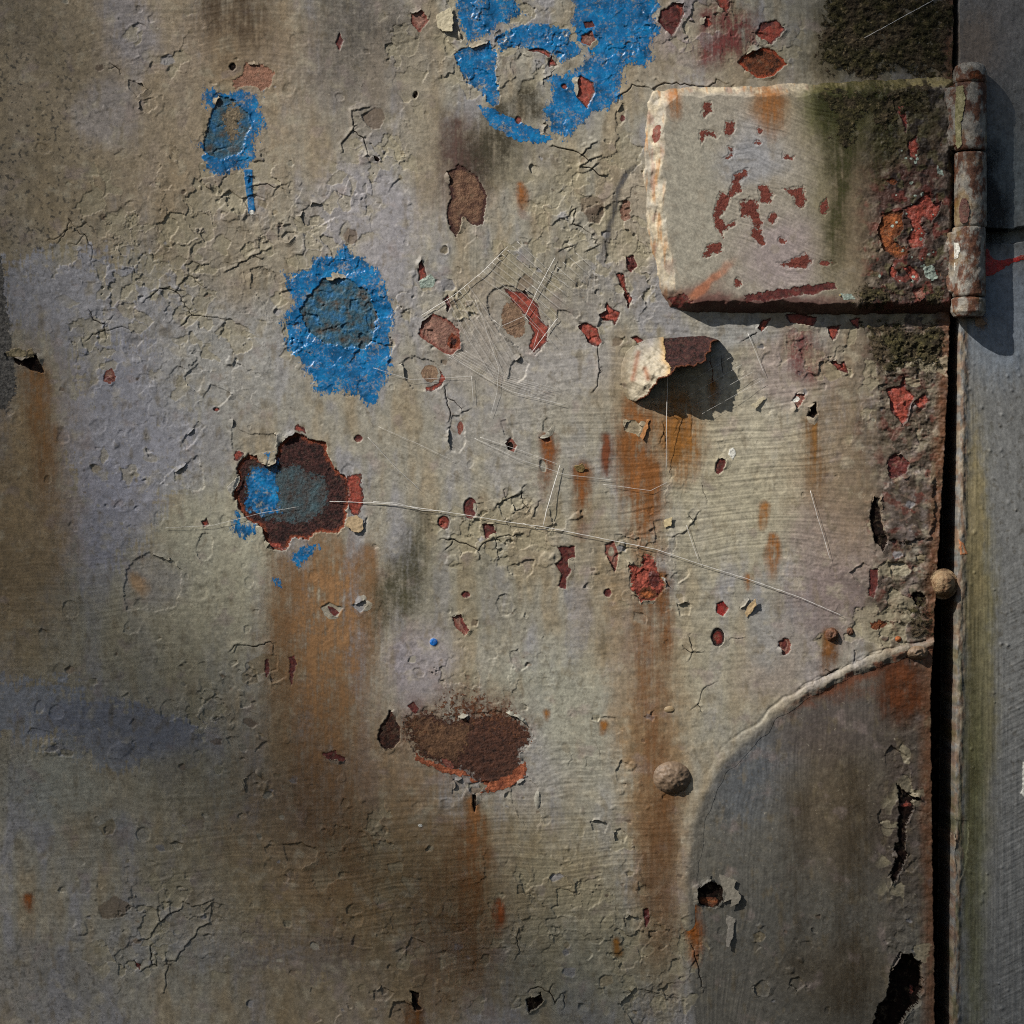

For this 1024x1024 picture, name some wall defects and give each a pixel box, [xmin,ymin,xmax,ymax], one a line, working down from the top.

crack [554,146,600,176]
crack [52,218,92,247]
spalling [444,165,487,237]
crack [150,276,215,319]
peeling [227,476,240,494]
spalling [228,419,282,455]
corrosion [602,394,699,537]
peeling [345,515,368,533]
peeling [868,451,936,598]
corrosion [378,688,537,925]
crack [145,901,210,991]
peeling [692,874,741,947]